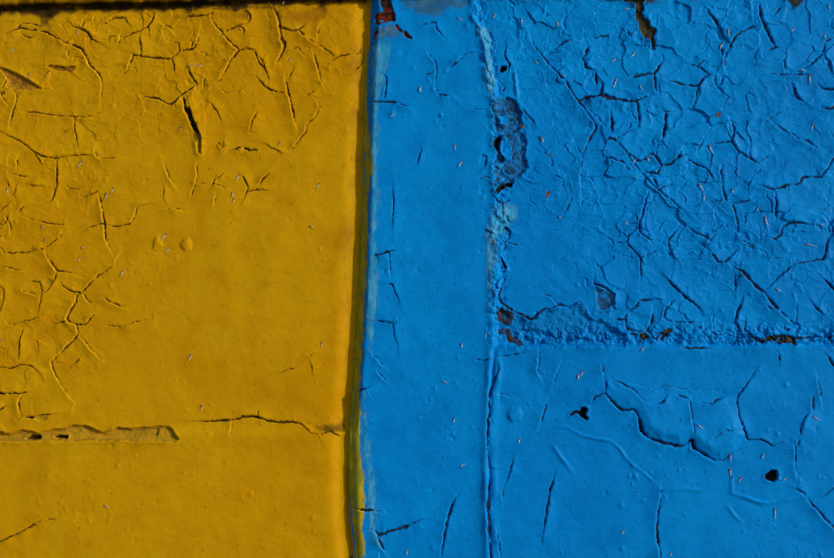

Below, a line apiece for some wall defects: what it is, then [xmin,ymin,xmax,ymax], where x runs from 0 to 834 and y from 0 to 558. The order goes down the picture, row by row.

peeling [492,97,528,186]
crack [0,8,363,392]
crack [498,6,834,367]
crack [374,250,397,296]
crack [0,392,51,419]
peeling [0,425,178,442]
crack [202,411,340,437]
crack [477,352,557,558]
crack [590,365,821,469]
crack [359,505,423,550]
crack [441,497,456,554]
crack [654,499,662,558]